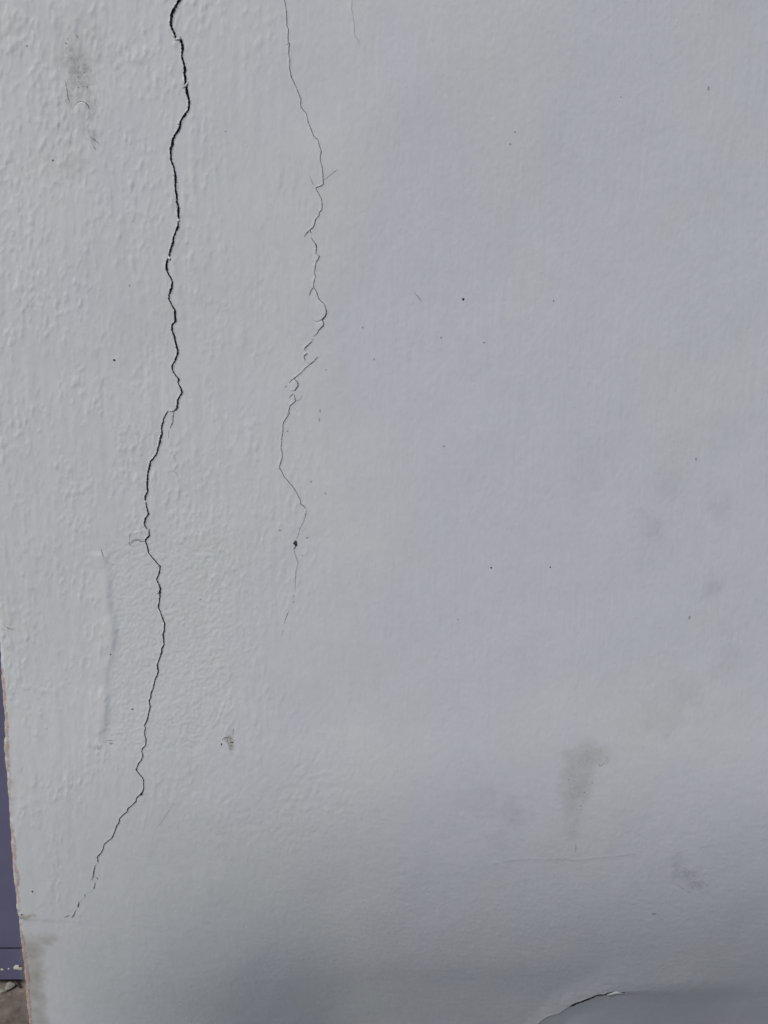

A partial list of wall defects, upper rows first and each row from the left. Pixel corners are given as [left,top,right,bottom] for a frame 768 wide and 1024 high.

crack [64,0,192,918]
crack [277,0,335,582]